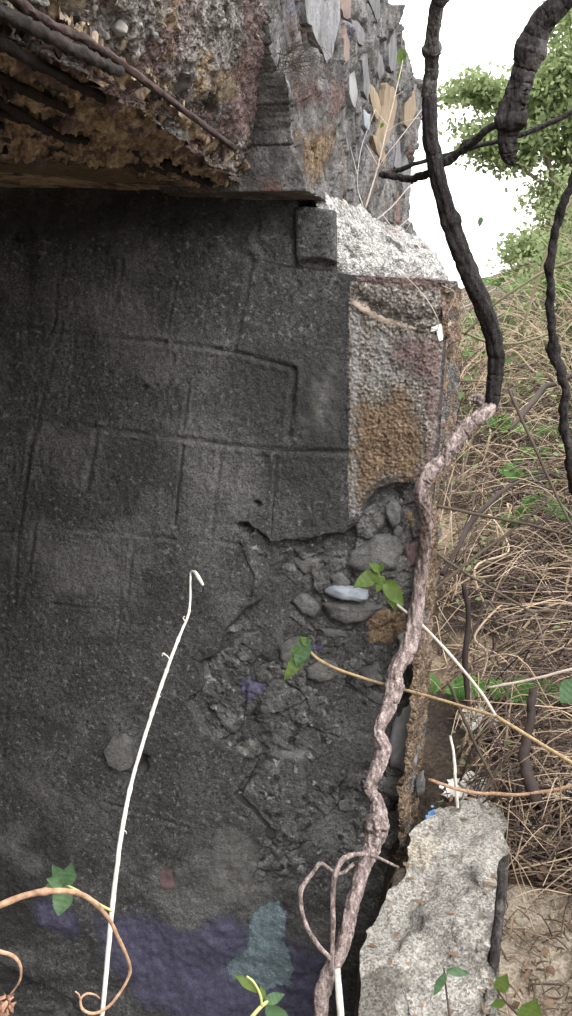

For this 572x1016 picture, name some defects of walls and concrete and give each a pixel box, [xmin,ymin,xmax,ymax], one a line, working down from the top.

spalling [0,0,268,190]
corrosion [209,0,266,141]
spalling [189,477,425,902]